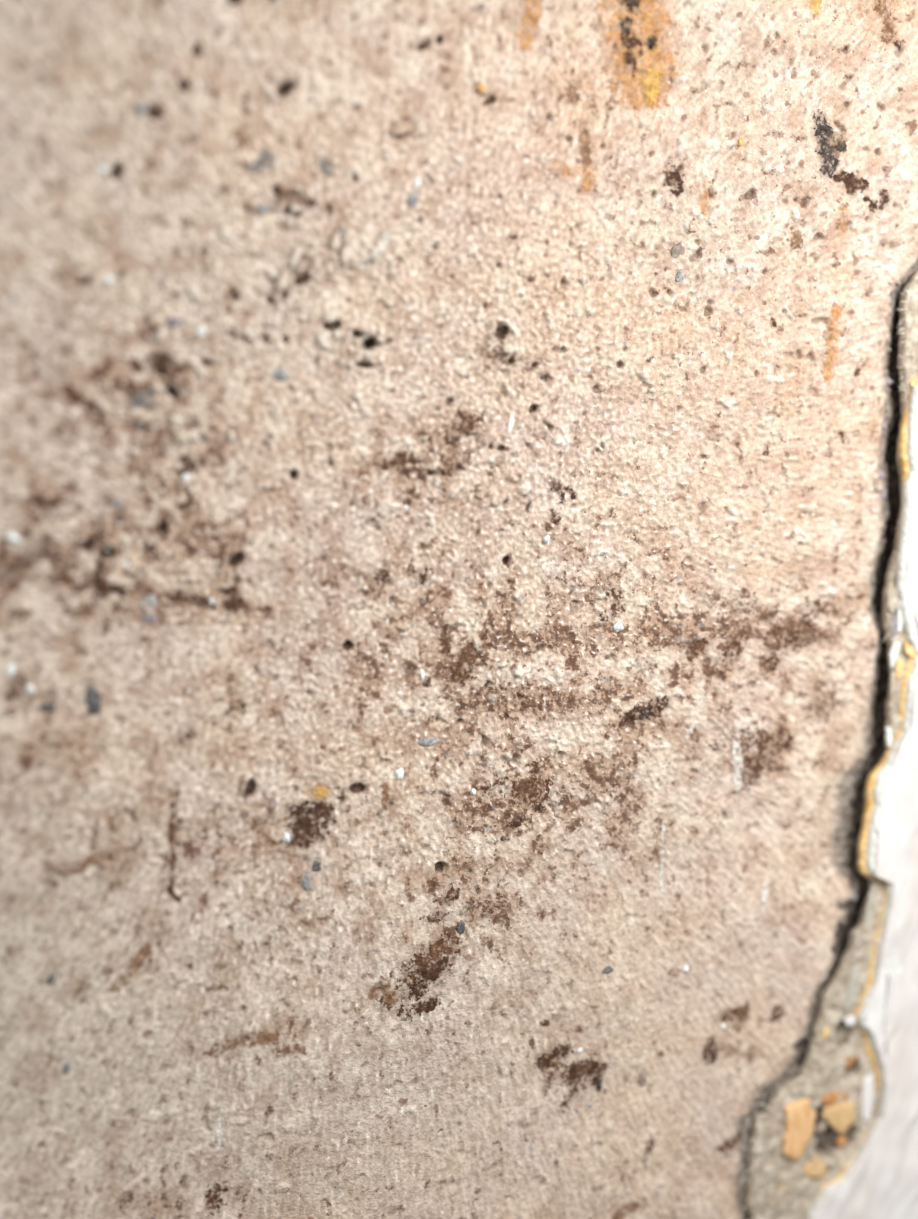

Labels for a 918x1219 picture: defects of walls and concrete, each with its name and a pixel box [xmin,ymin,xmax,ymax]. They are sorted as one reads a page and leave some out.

rust [557,0,680,118]